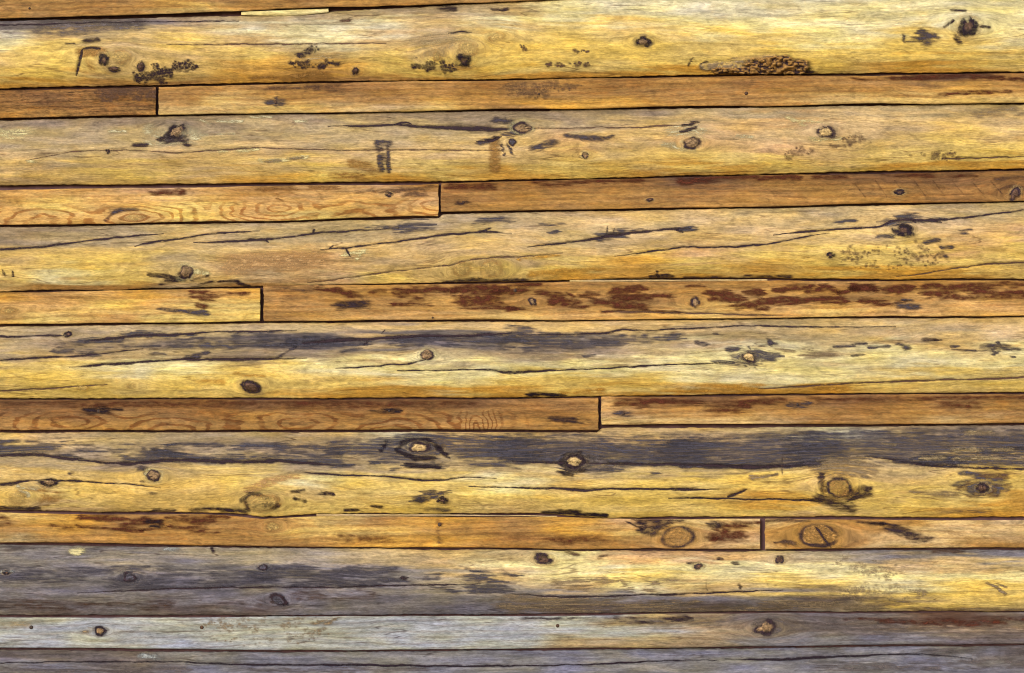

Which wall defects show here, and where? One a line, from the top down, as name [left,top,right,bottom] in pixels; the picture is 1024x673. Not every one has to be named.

crack [0,209,1024,283]
crack [0,311,896,391]
crack [0,453,831,548]
crack [868,456,1024,470]